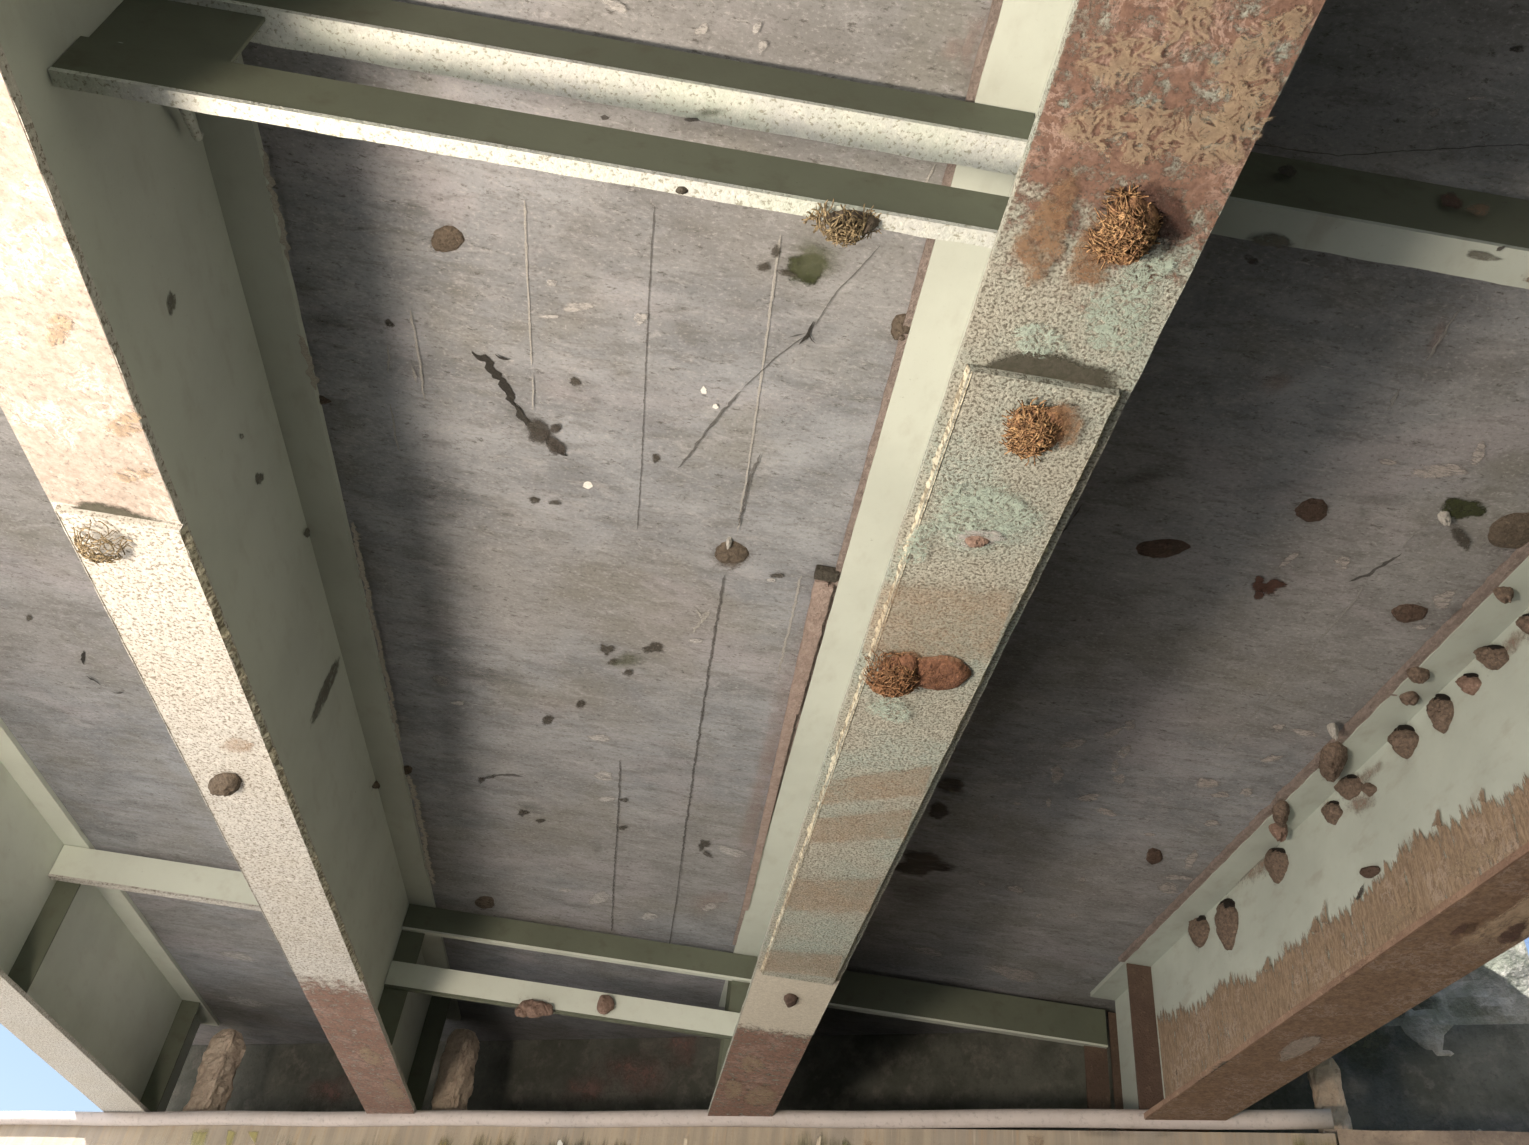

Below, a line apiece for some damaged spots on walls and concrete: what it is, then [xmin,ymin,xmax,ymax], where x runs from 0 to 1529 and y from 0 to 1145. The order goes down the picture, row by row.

rust [1004,0,1326,312]
crack [637,206,655,529]
crack [678,247,879,468]
crack [738,454,761,526]
crack [669,575,725,943]
rust [296,974,415,1114]
rust [708,1020,812,1117]
rust [1129,774,1529,1132]
peeling [1356,866,1381,899]
peeling [1449,896,1529,951]